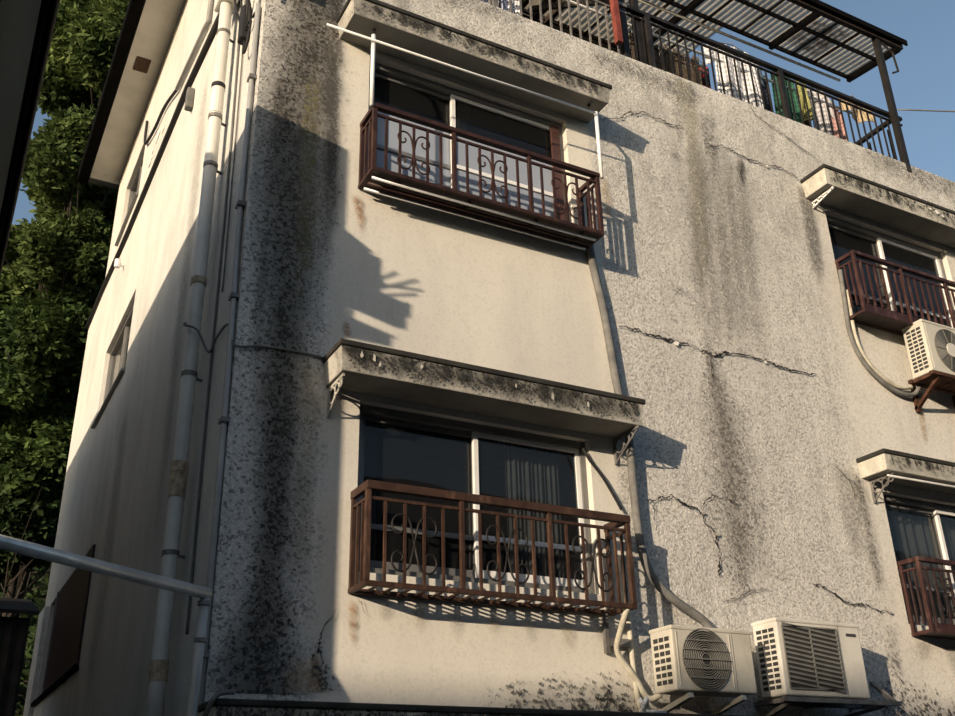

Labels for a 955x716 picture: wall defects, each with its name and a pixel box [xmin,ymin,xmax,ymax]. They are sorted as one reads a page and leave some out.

damp [357,0,603,94]
crack [599,110,798,181]
damp [800,188,820,272]
damp [215,0,347,695]
damp [341,345,639,420]
crack [616,325,818,384]
crack [644,494,738,578]
crack [724,574,893,614]
crack [318,610,335,680]
damp [215,673,638,716]
damp [877,626,955,716]